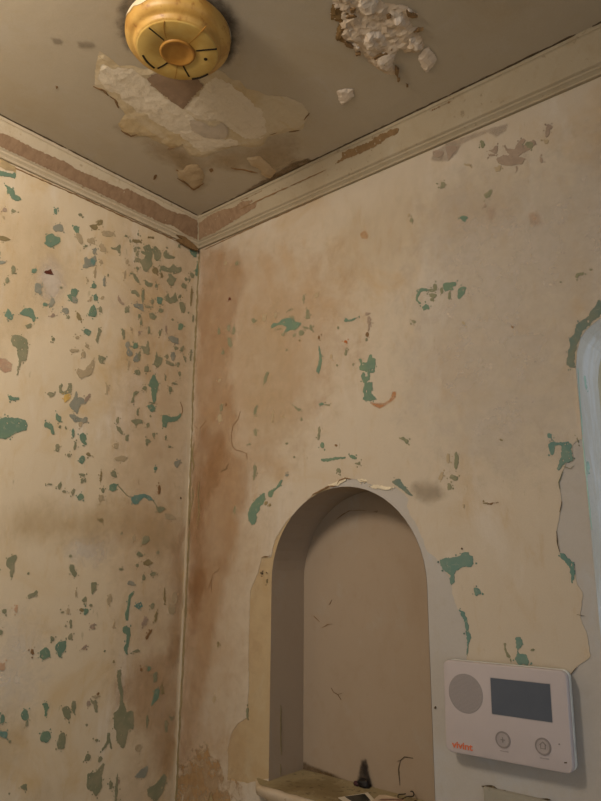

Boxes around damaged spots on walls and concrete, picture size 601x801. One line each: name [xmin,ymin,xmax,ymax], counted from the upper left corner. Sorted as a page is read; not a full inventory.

spalling [330,0,437,87]
peeling [93,51,309,191]
peeling [335,128,399,164]
peeling [479,123,553,174]
peeling [0,133,257,505]
peeling [566,300,601,371]
peeling [130,482,176,522]
peeling [0,554,17,577]
peeling [112,532,184,655]
peeling [308,426,601,801]